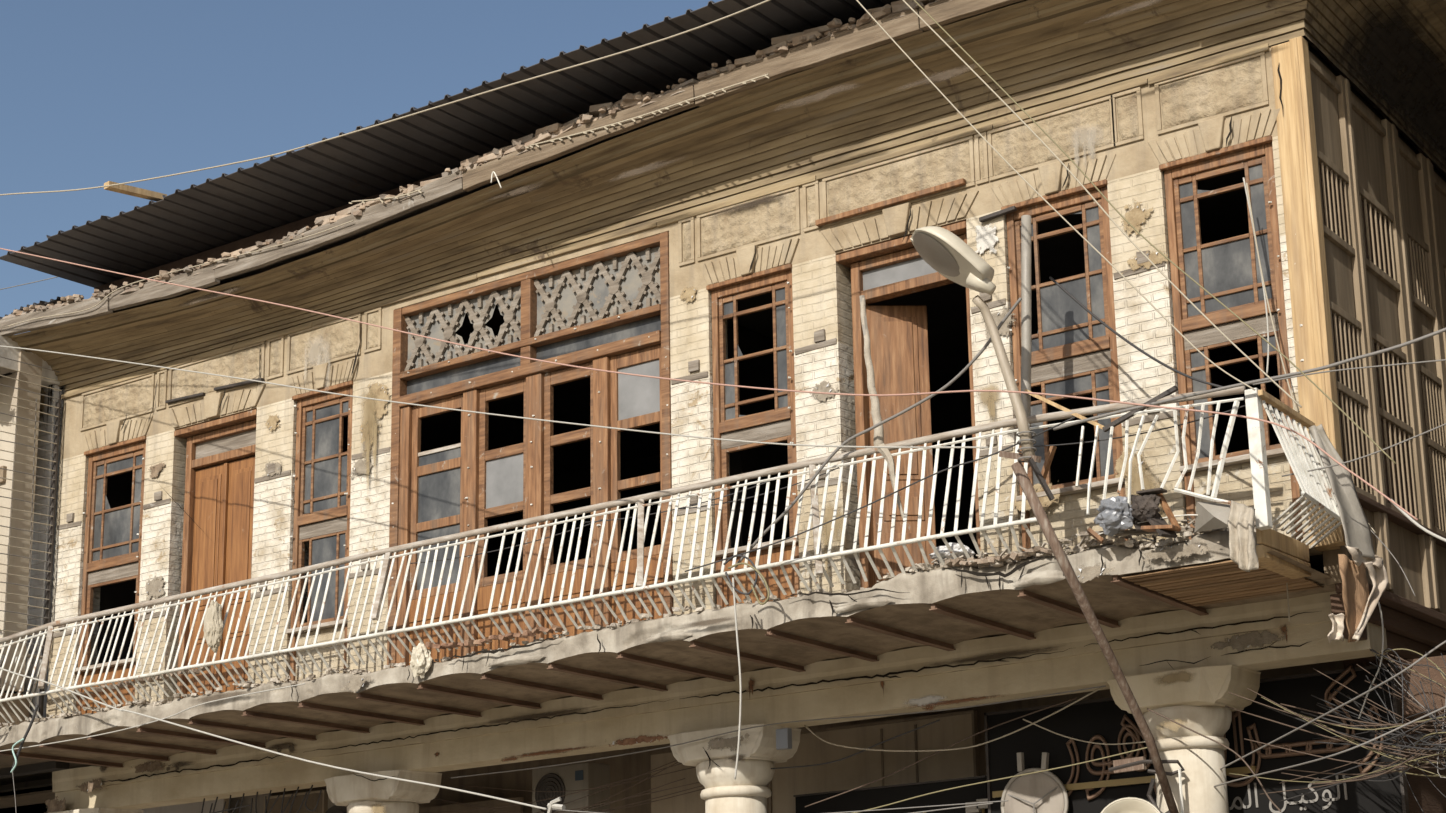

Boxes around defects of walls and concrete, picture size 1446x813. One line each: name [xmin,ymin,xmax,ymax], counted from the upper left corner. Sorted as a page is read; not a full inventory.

crack [1276,65,1284,110]
crack [1225,116,1233,146]
peeling [1121,200,1153,236]
peeling [975,222,998,254]
crack [952,556,1053,590]
peeling [1211,630,1286,651]
crack [101,611,1319,783]